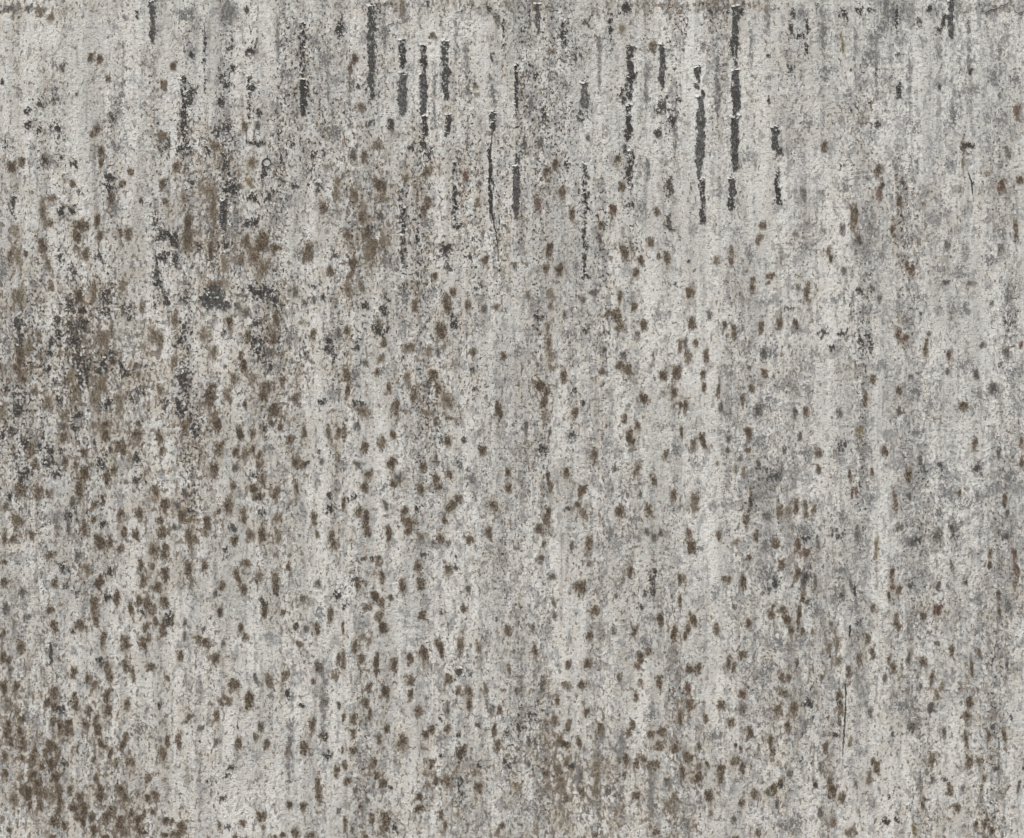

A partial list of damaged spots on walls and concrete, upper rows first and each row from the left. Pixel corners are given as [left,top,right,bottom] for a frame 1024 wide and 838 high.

leakage [176,3,199,24]
leakage [309,37,333,100]
leakage [324,55,353,144]
leakage [644,59,655,109]
leakage [697,38,724,116]
leakage [747,5,771,75]
crack [488,130,499,251]